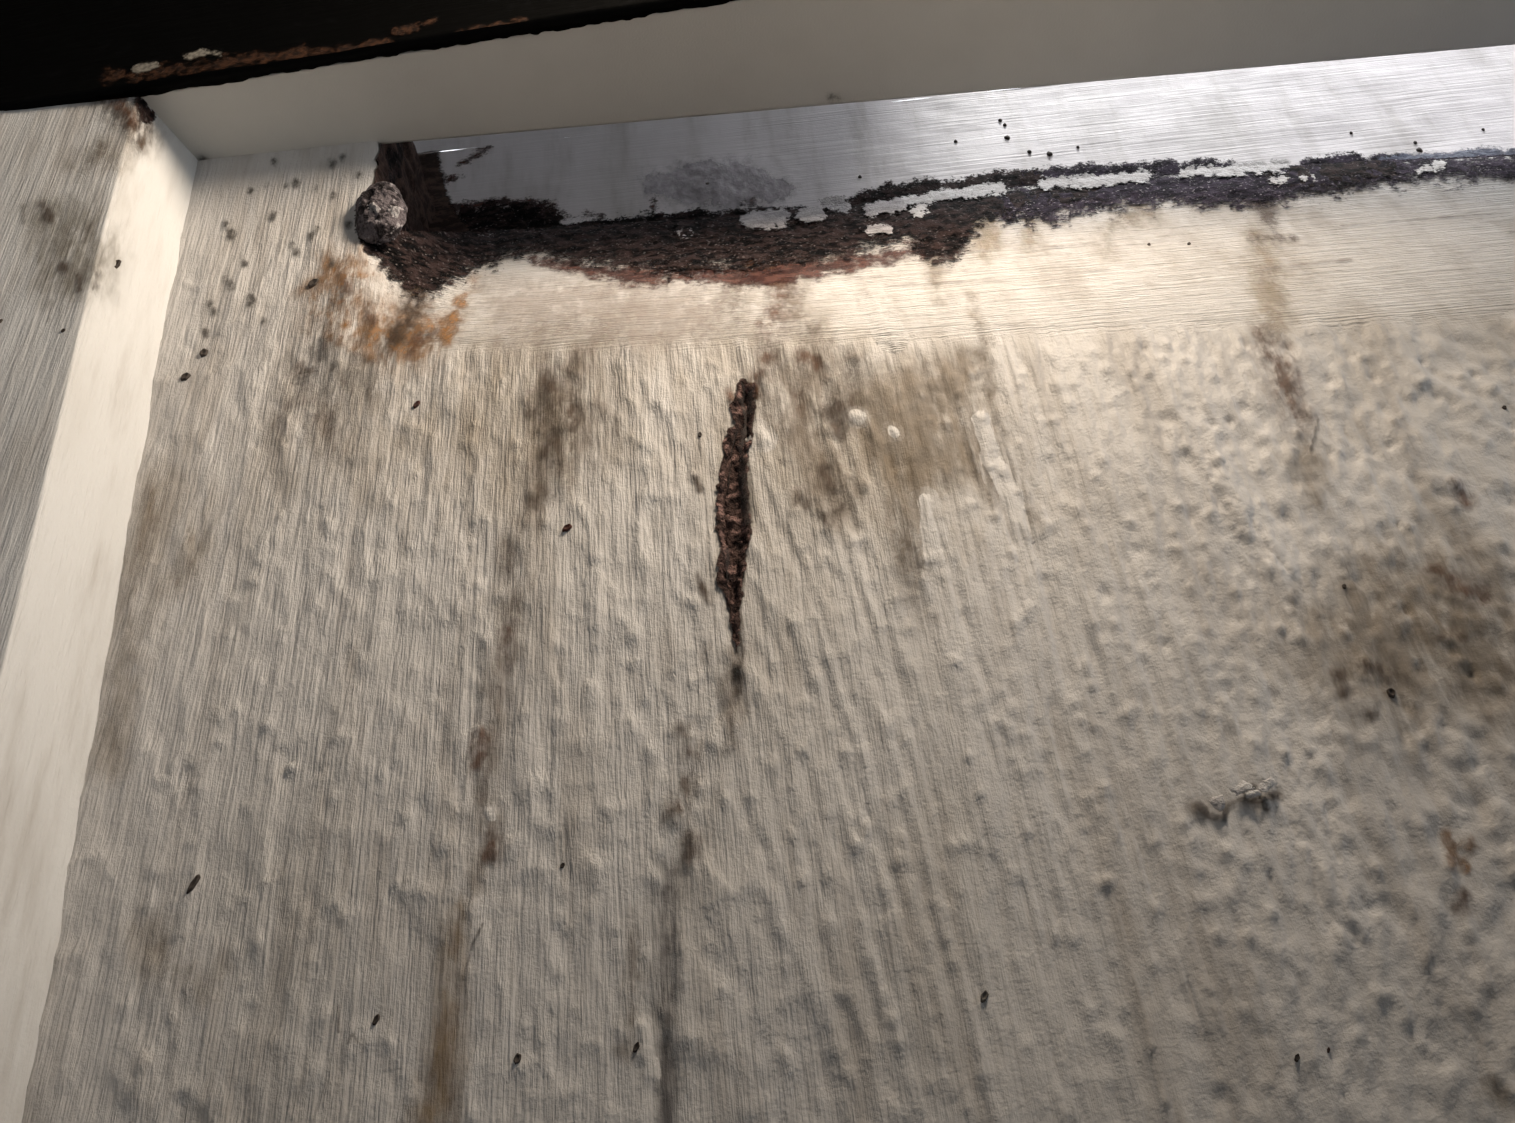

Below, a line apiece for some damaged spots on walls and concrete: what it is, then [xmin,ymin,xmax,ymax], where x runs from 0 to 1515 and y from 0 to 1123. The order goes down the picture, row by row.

peeling [646,162,794,208]
rust [311,256,466,361]
damp [684,833,694,860]
damp [662,1011,672,1123]